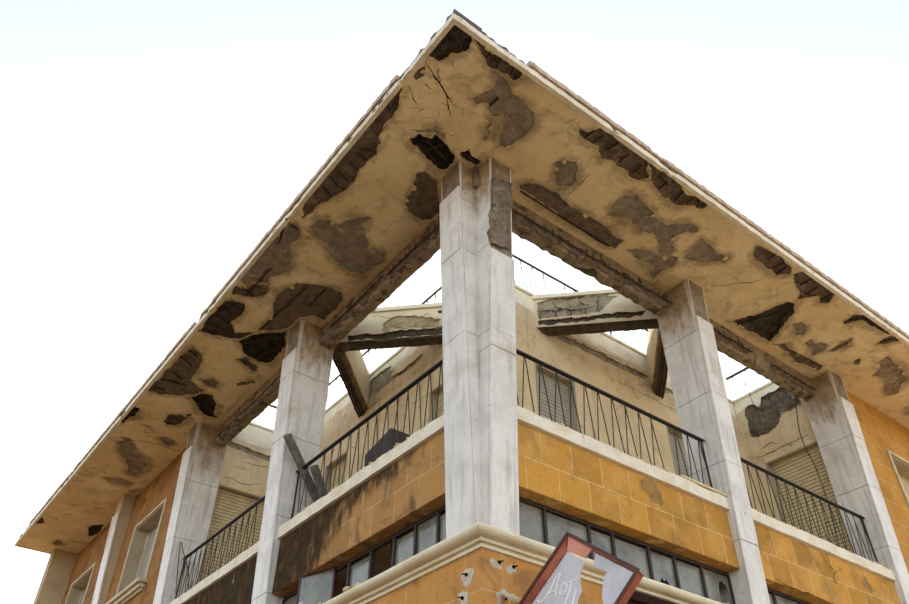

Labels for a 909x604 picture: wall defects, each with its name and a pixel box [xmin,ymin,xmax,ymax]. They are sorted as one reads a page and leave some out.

crack [409,61,463,116]
peeling [429,25,534,149]
spalling [579,126,707,208]
spalling [198,80,480,386]
peeling [487,160,732,308]
spalling [149,347,218,425]
peeling [369,355,422,397]
peeling [537,295,647,379]
spalling [745,364,815,437]
spalling [733,245,853,369]
spalling [843,315,898,344]
peeling [872,356,909,395]